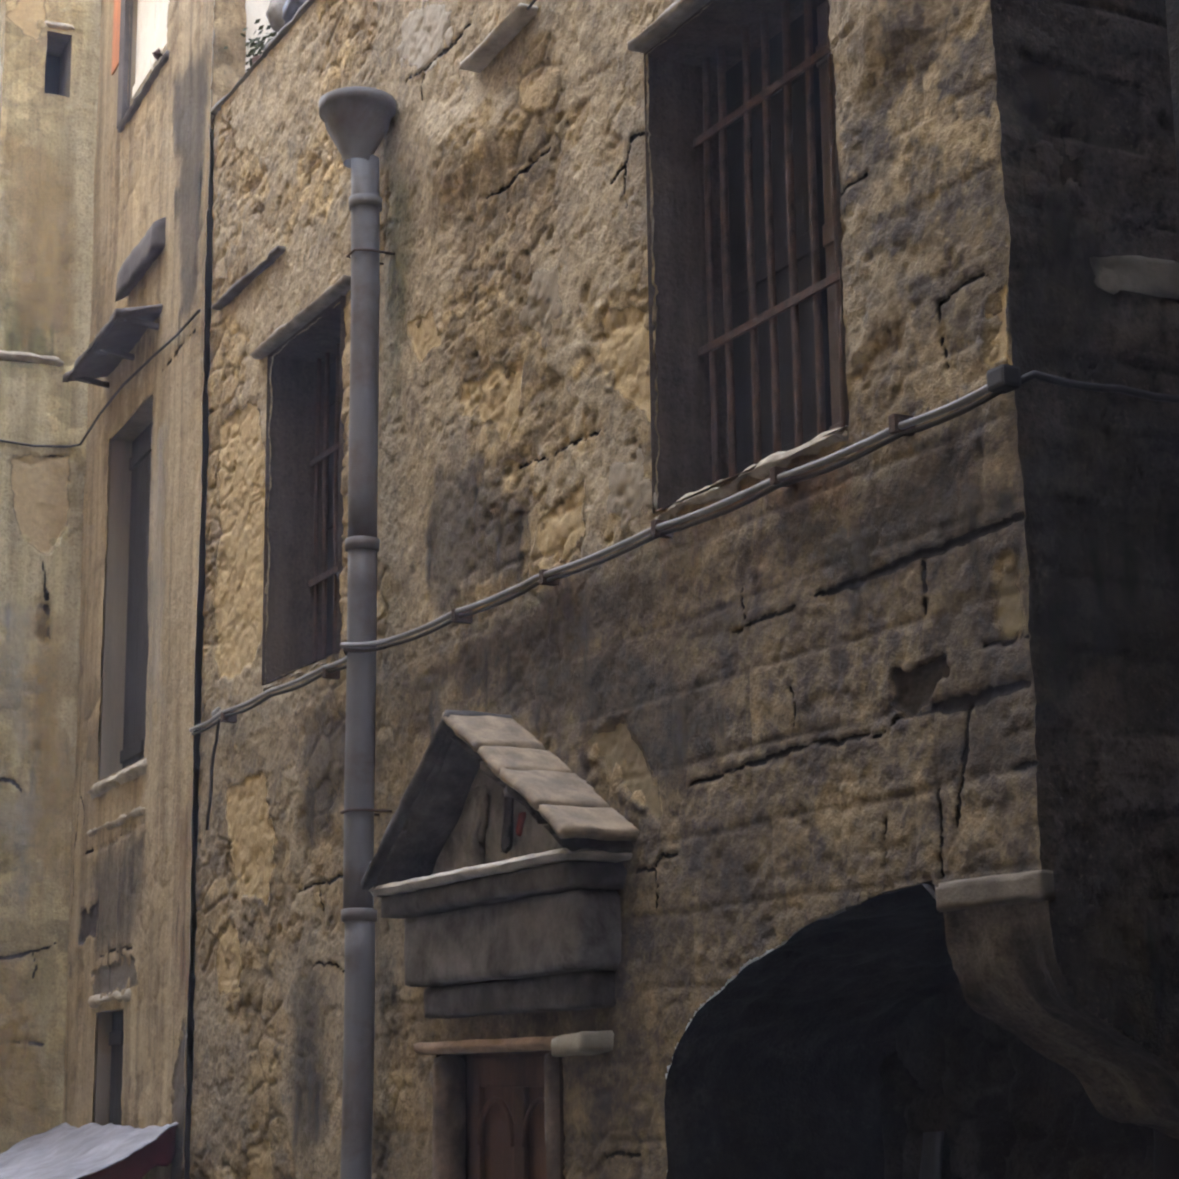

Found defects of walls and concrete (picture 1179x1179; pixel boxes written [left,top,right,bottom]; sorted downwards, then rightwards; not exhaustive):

crack [610,131,645,209]
spalling [890,653,950,736]
crack [0,777,22,793]
crack [689,680,1032,878]
crack [0,942,56,978]